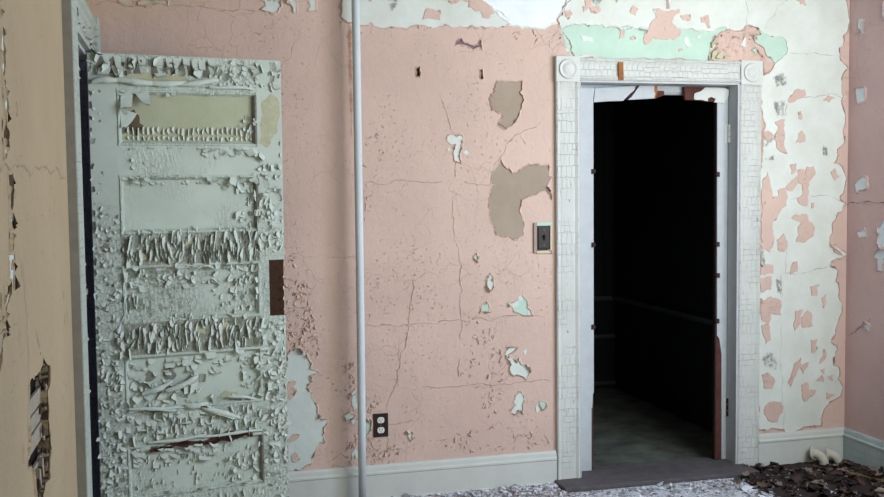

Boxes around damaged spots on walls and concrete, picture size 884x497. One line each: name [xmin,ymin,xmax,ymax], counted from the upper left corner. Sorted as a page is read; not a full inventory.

peeling [77,7,281,144]
peeling [259,0,318,16]
peeling [0,0,20,370]
peeling [85,88,329,497]
crack [366,122,551,425]
peeling [340,0,869,433]
crack [788,195,884,205]
peeling [857,219,884,272]
spalling [27,352,52,497]